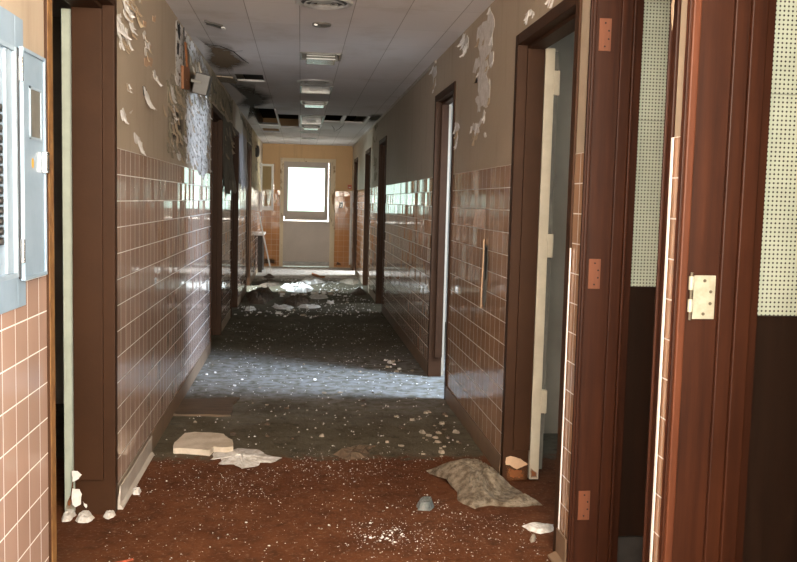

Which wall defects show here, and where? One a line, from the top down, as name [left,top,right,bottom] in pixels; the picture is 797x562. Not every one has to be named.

peeling [117,0,261,197]
peeling [458,8,495,146]
peeling [72,471,87,508]